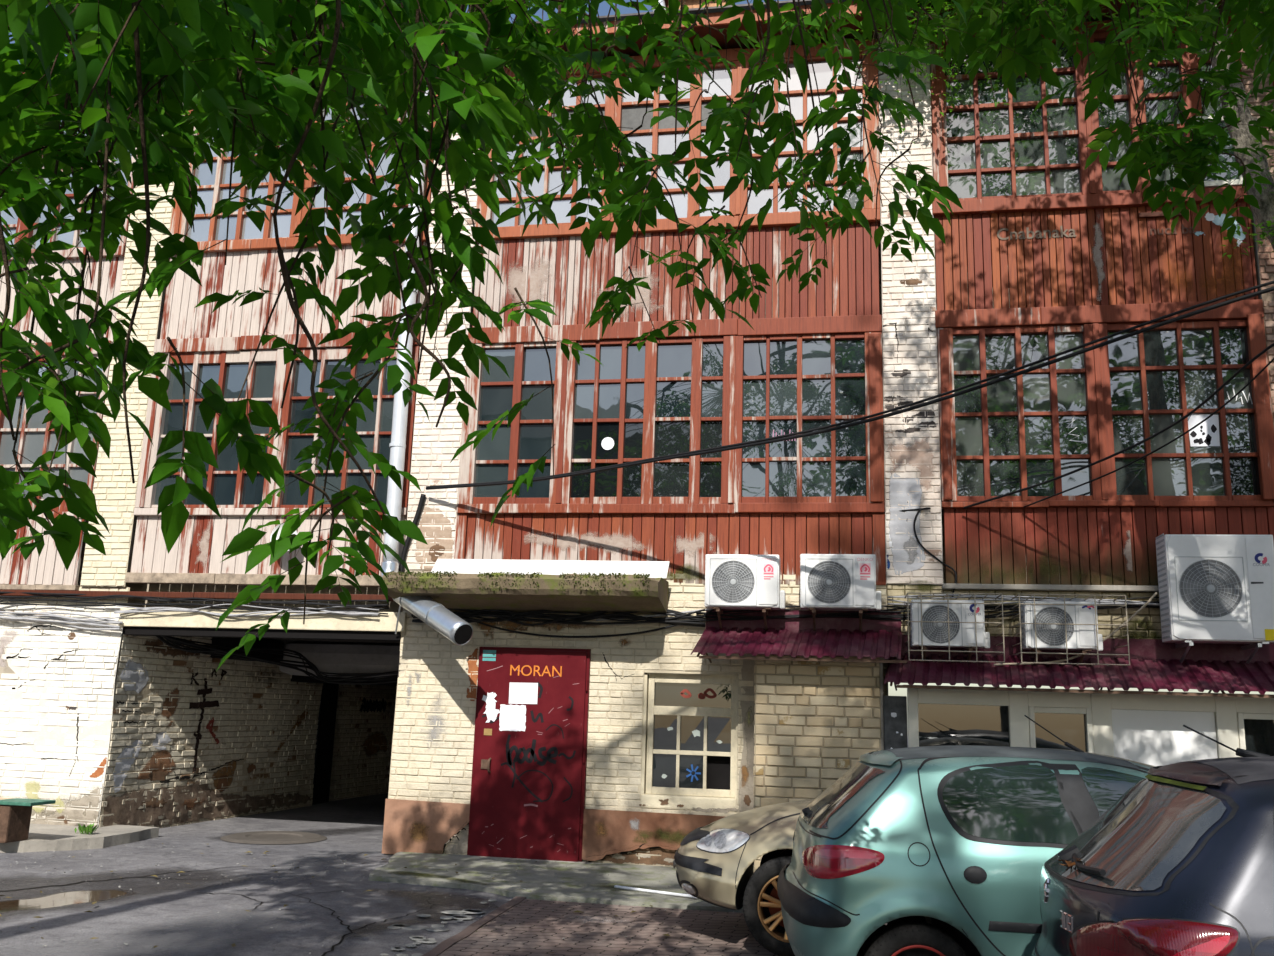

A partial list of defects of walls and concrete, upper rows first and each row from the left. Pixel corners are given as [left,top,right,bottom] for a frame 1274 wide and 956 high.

peeling [1093,225,1105,300]
spalling [884,396,936,489]
peeling [525,533,642,552]
peeling [676,534,716,556]
spalling [162,688,179,721]
spalling [30,750,313,827]
crack [0,866,435,956]